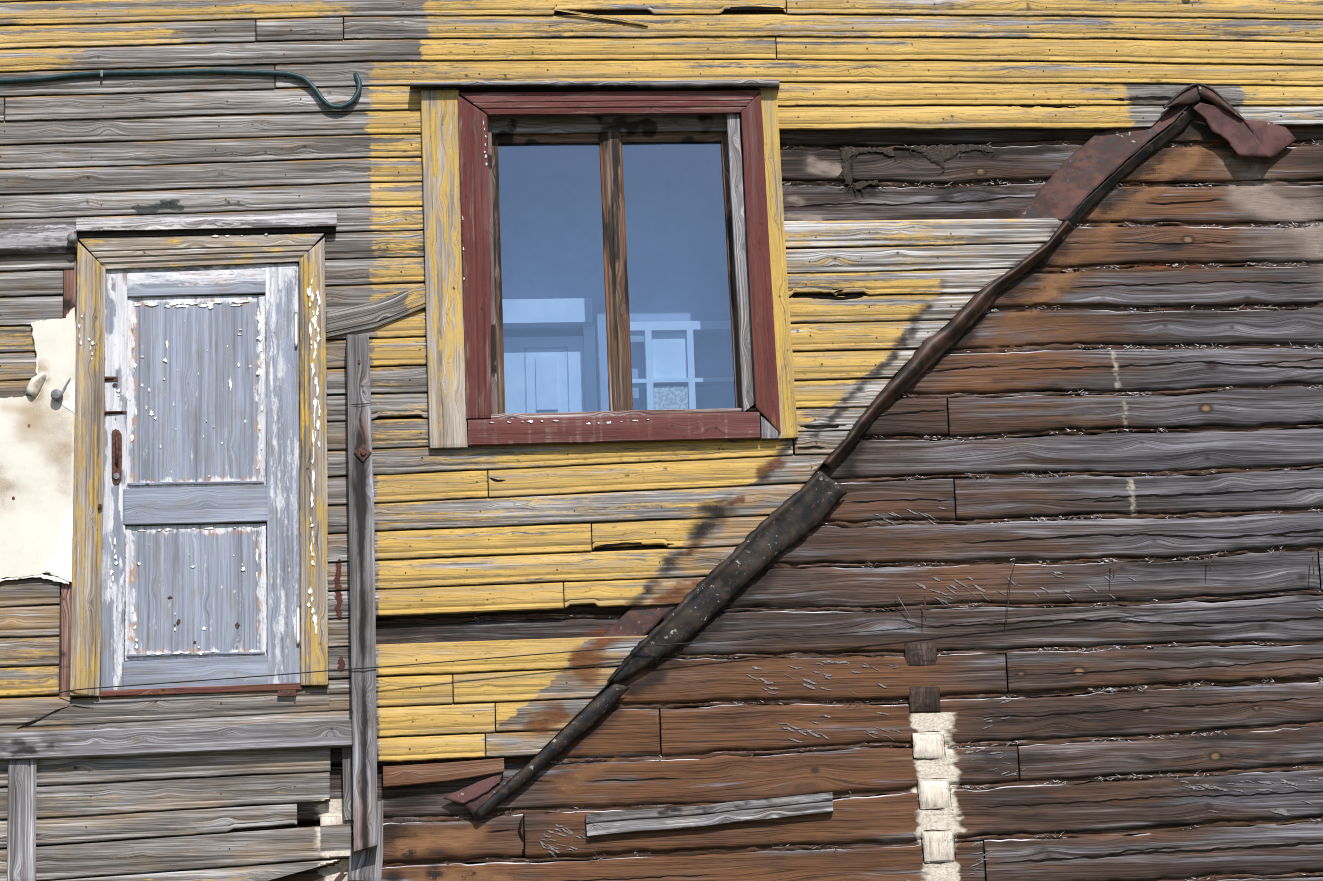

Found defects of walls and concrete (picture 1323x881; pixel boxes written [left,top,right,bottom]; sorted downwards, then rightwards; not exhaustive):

crack [725,4,786,12]
corrosion [1108,261,1208,271]
peeling [131,300,264,429]
peeling [307,280,321,566]
corrosion [756,458,786,475]
peeling [132,606,259,655]
peeling [307,587,317,634]
corrosion [655,581,700,609]
corrosion [571,630,619,682]
corrosion [528,704,568,732]